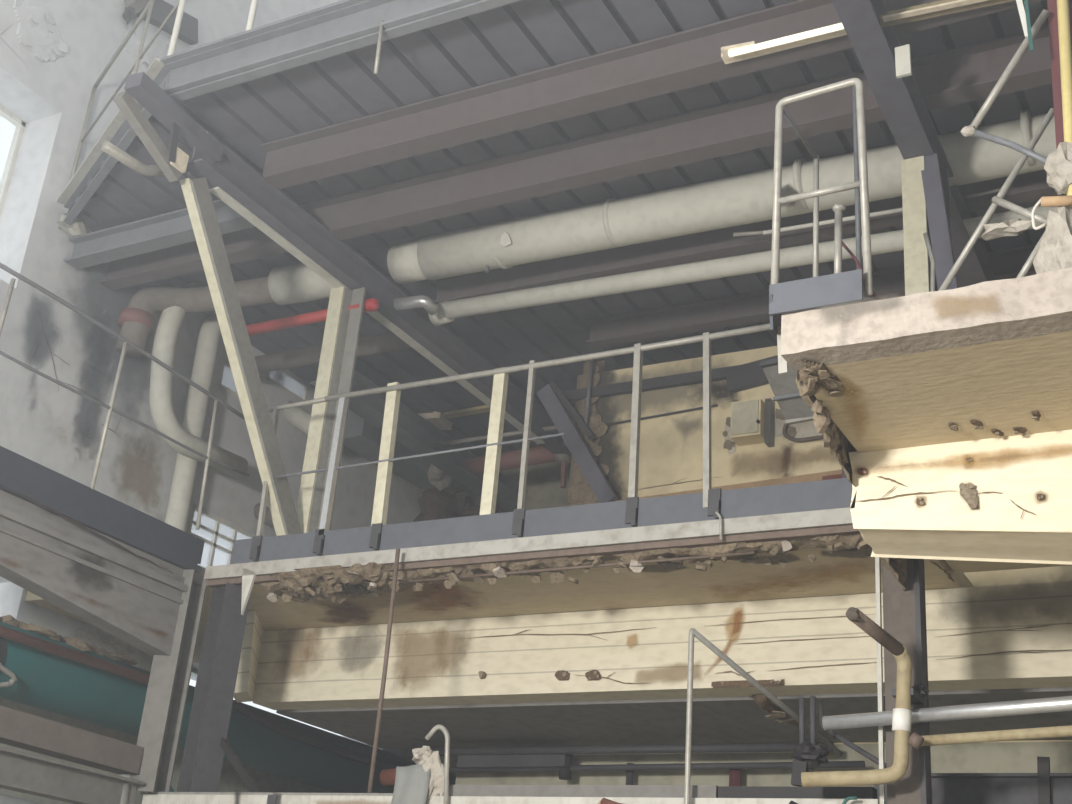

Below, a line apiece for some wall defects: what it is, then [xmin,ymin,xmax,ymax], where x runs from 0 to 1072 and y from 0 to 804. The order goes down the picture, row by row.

water stain [27,298,56,362]
water stain [79,264,147,441]
spalling [775,360,868,484]
crack [849,476,943,502]
crack [978,492,1036,518]
spalling [260,534,907,604]
rust [716,610,742,663]